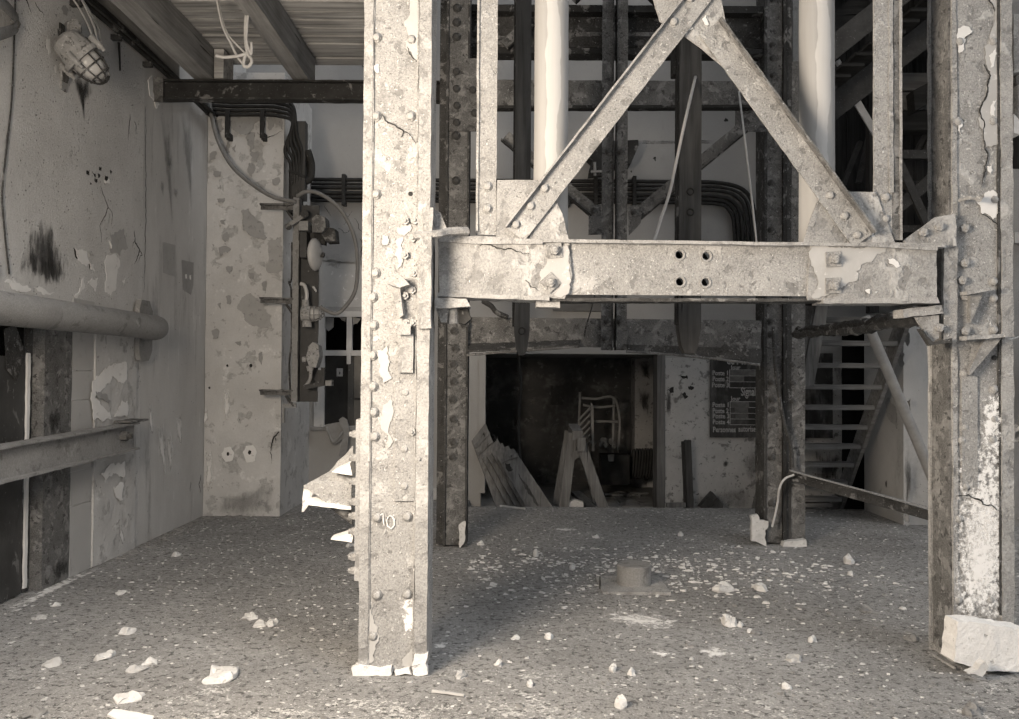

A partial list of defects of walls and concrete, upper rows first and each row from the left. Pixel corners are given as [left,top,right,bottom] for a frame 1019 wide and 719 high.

peeling [956,26,972,53]
peeling [978,0,1000,147]
peeling [207,112,283,177]
crack [382,115,415,142]
peeling [218,209,284,328]
peeling [382,223,412,268]
peeling [809,246,901,299]
peeling [90,361,129,422]
peeling [101,461,125,501]